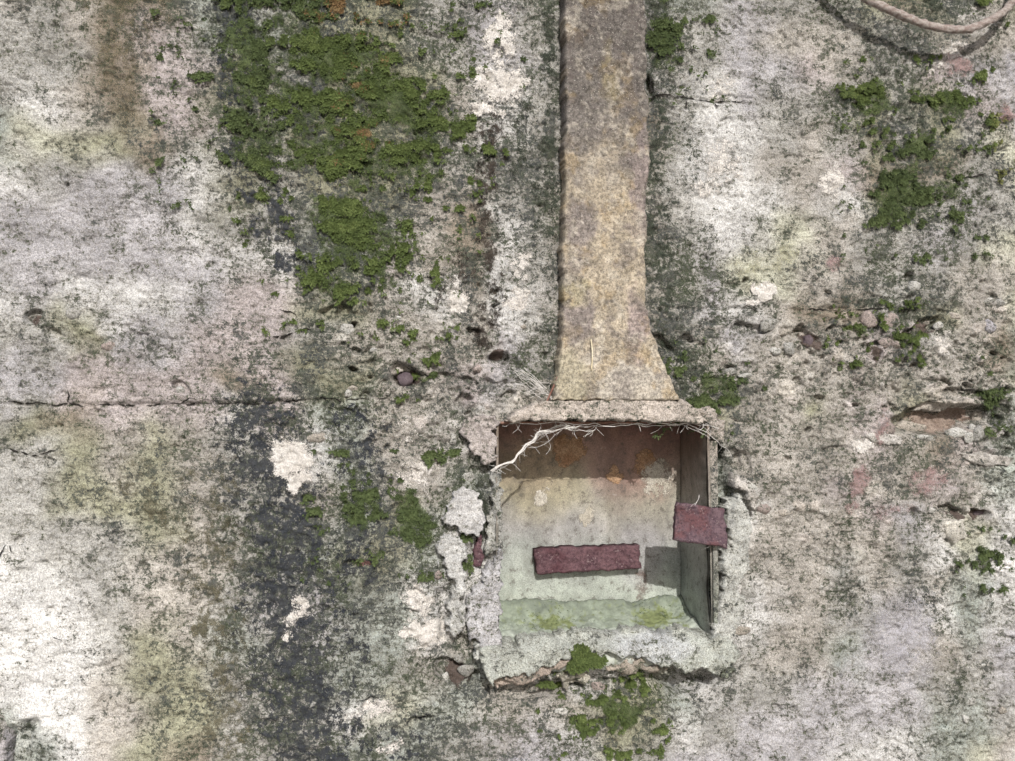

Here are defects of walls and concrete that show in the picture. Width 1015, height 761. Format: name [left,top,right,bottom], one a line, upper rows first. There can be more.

crack [8,390,392,407]
peeling [909,398,977,412]
peeling [394,398,725,661]
leakage [111,365,450,761]
peeling [709,472,759,642]
peeling [494,659,590,689]
peeling [606,657,668,675]
peeling [719,663,737,678]